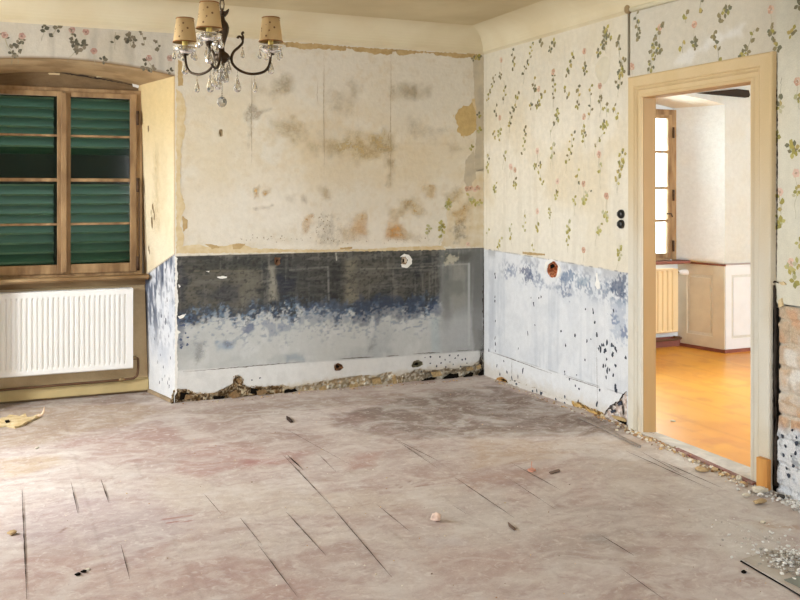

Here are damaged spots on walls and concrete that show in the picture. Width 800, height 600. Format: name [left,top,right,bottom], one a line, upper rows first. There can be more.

peeling [280,42,477,58]
peeling [153,60,496,404]
peeling [522,252,561,279]
spalling [555,308,627,425]
flaking render [776,298,800,501]